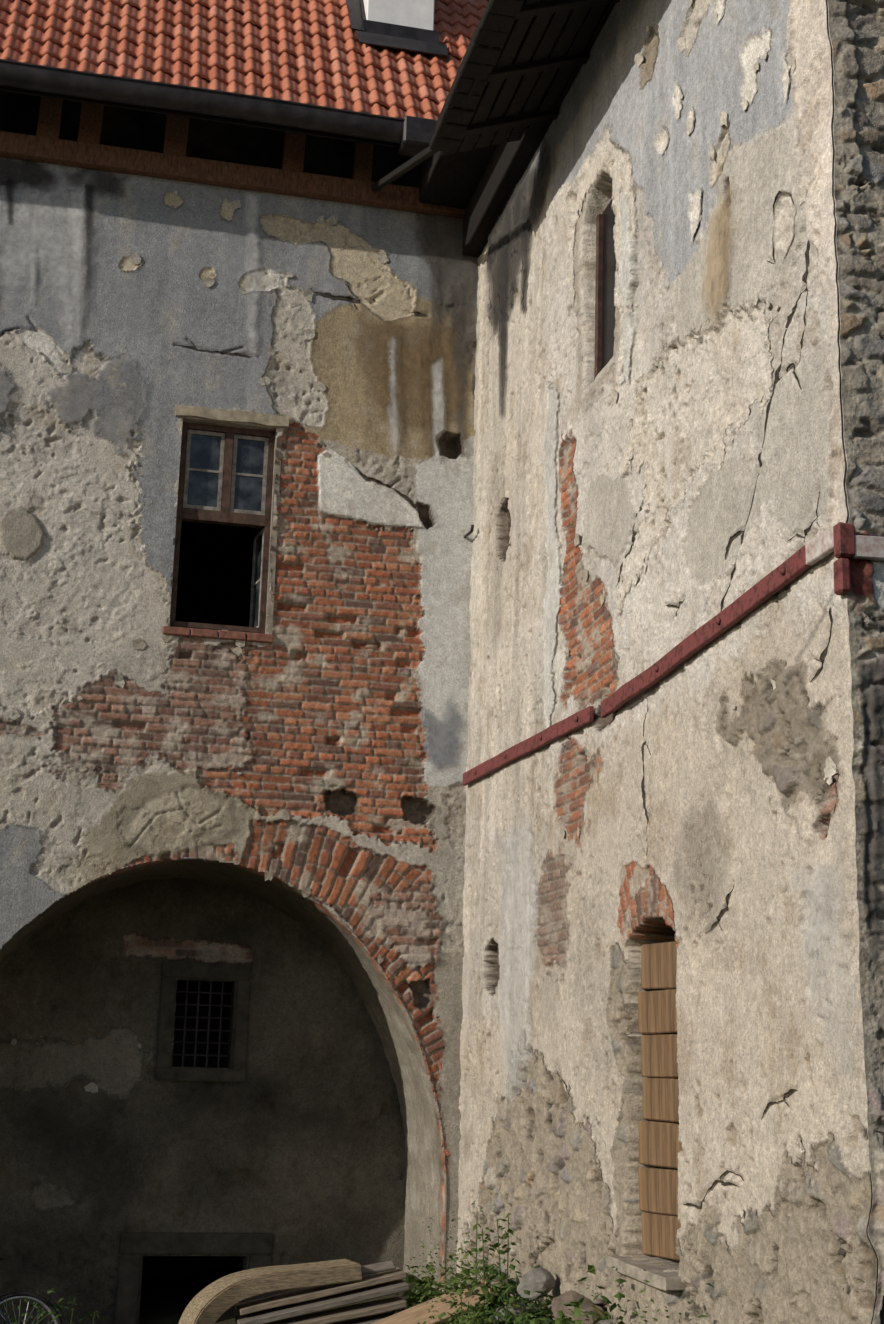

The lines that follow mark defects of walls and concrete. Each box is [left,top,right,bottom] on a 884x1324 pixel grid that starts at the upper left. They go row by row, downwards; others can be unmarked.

water stain [0,159,124,342]
peeling [259,214,416,321]
water stain [705,204,731,310]
peeling [739,0,847,527]
peeling [558,139,779,708]
crack [721,191,810,611]
rust [850,559,874,595]
flaking render [0,267,450,1172]
crack [641,699,651,856]
flaking render [813,770,840,839]
crack [761,1089,796,1120]
crack [683,1170,744,1209]